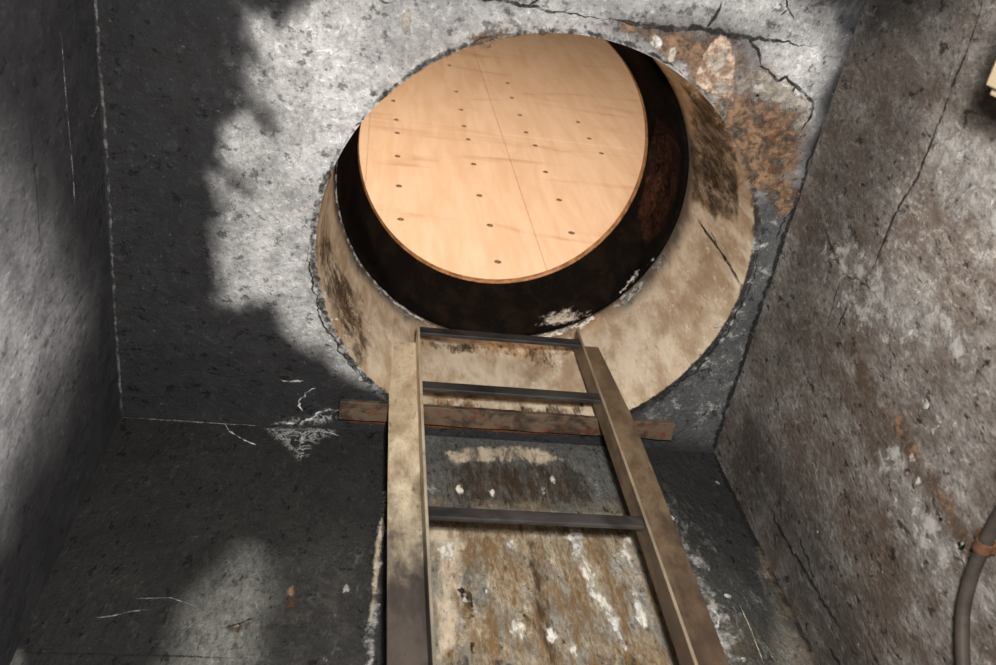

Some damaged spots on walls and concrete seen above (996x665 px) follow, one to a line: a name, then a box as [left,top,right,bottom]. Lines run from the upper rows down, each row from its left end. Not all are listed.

crack [94,3,122,407]
crack [424,425,590,436]
crack [482,0,842,665]
rust [621,24,711,97]
rust [714,92,804,216]
crack [824,0,983,330]